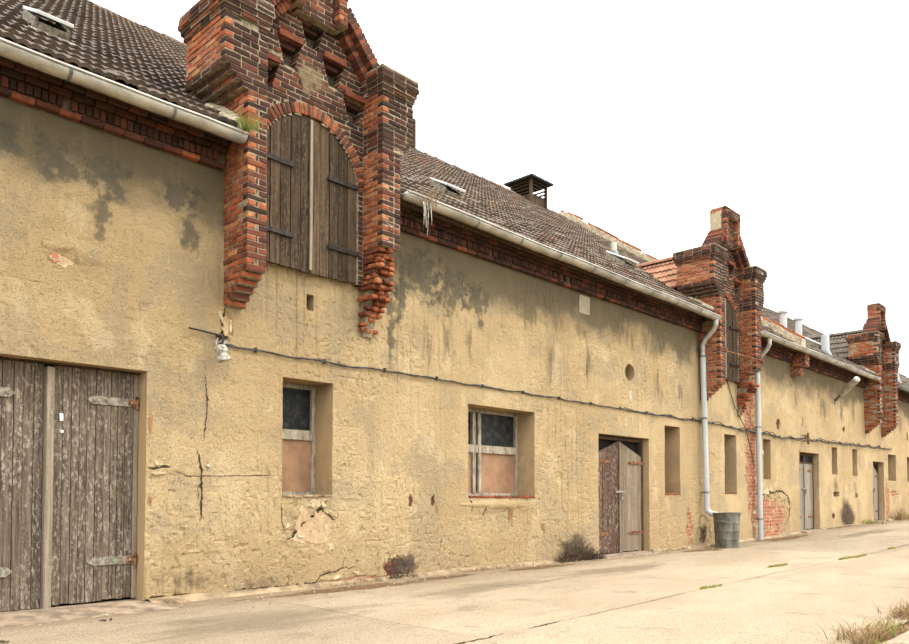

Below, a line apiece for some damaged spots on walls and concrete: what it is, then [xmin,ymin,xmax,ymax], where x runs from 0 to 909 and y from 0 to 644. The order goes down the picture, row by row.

leakage [165,183,203,247]
flaking render [48,251,76,268]
crack [148,374,275,521]
flaking render [744,393,789,537]
flaking render [285,499,334,552]